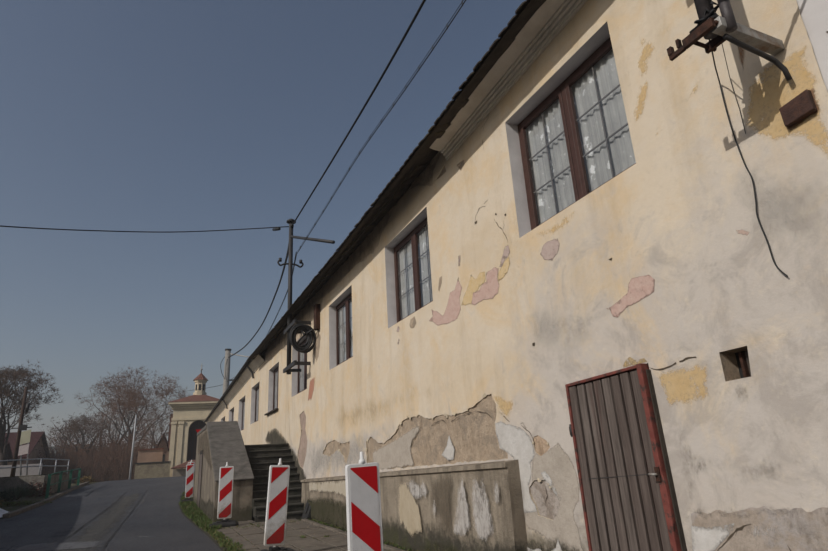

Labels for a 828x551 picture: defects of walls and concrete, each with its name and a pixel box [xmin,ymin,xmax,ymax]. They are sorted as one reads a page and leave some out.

peeling [540,218,568,261]
peeling [429,246,510,326]
peeling [606,275,655,318]
flaking render [298,411,307,468]
flaking render [323,440,350,463]
flaking render [365,393,513,469]
flaking render [532,436,550,456]
leakage [399,479,499,539]
flaking render [530,478,560,520]